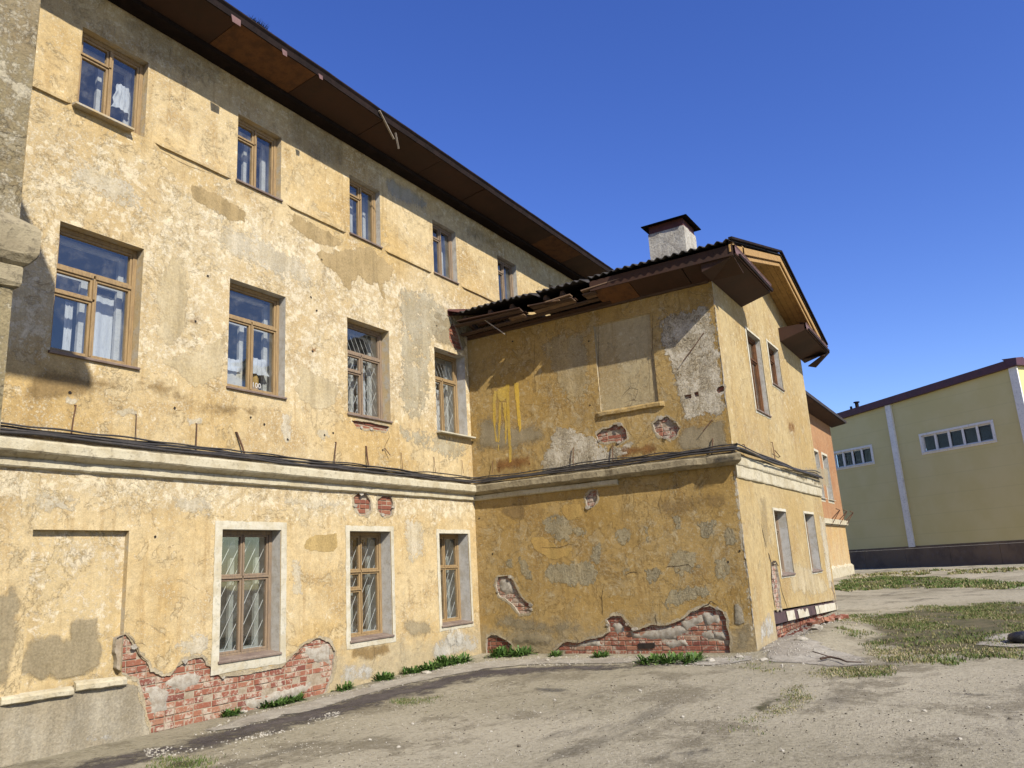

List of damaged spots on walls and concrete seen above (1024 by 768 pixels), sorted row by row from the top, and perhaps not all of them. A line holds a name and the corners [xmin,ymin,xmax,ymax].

peeling [651,303,728,442]
peeling [540,422,633,471]
spalling [115,632,338,734]
spalling [352,493,395,519]
spalling [485,633,512,654]
spalling [493,557,533,617]
peeling [531,490,602,587]
spalling [553,549,733,654]